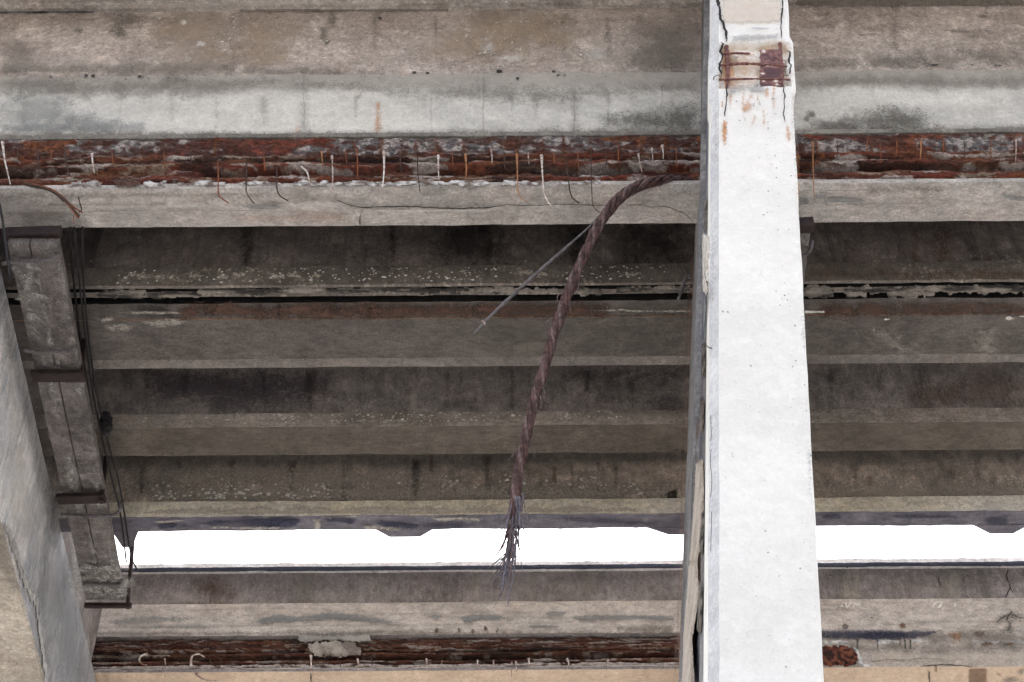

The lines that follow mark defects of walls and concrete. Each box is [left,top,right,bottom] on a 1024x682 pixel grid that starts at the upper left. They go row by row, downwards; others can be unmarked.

crack [713,0,728,117]
crack [780,0,792,120]
spalling [0,134,701,213]
spalling [791,133,1024,198]
peeling [12,263,61,369]
peeling [67,535,134,599]
spalling [91,459,704,682]